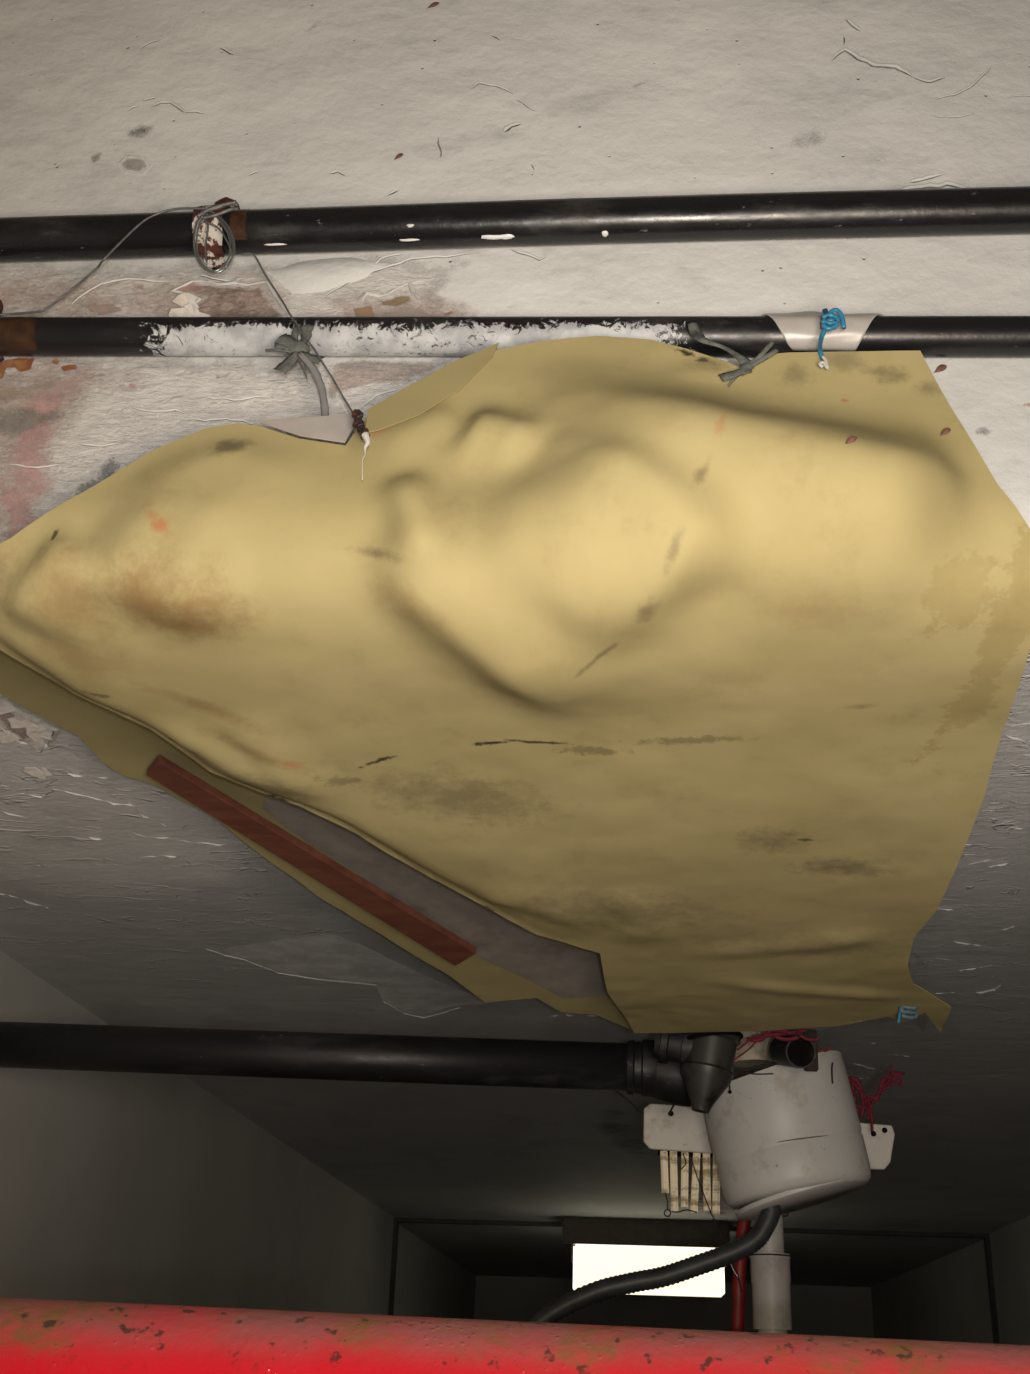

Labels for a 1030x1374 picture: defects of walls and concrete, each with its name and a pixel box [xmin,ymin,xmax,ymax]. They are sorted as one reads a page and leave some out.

peeling [0,259,457,317]
peeling [0,698,60,750]
peeling [205,935,489,1018]